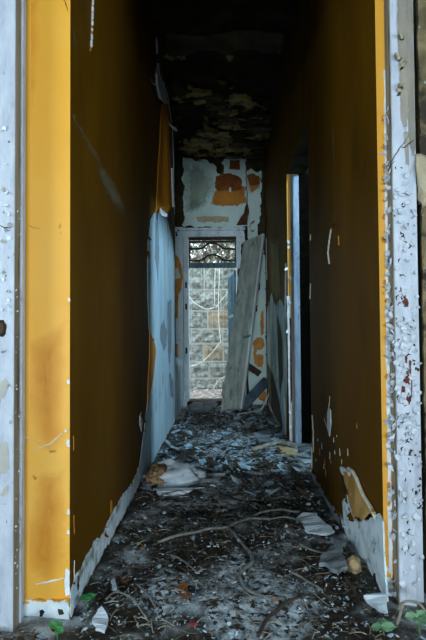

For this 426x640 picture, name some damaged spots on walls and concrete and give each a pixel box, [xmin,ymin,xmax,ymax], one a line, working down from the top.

peeling [392,0,417,262]
peeling [24,44,273,620]
peeling [248,248,293,442]
peeling [393,306,422,477]
spalling [311,415,424,602]